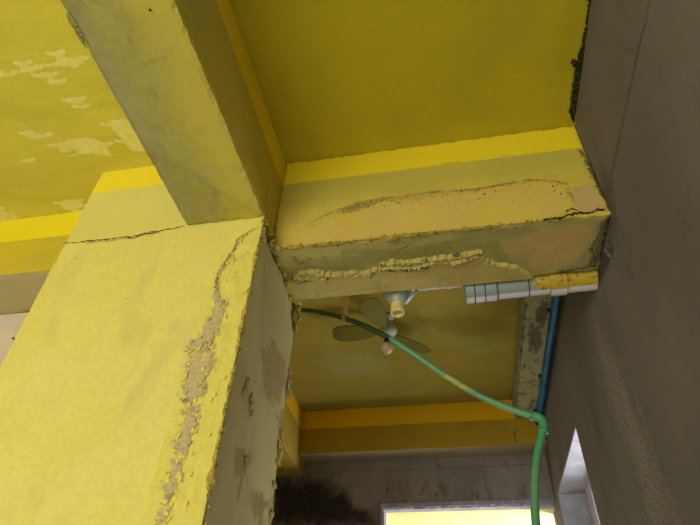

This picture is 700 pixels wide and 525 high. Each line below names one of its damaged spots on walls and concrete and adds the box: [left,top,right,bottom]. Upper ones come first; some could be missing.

peeling [0,12,91,85]
leakage [568,0,592,122]
peeling [18,118,145,157]
crack [65,226,181,244]
crack [542,206,605,221]
spalling [154,216,579,525]